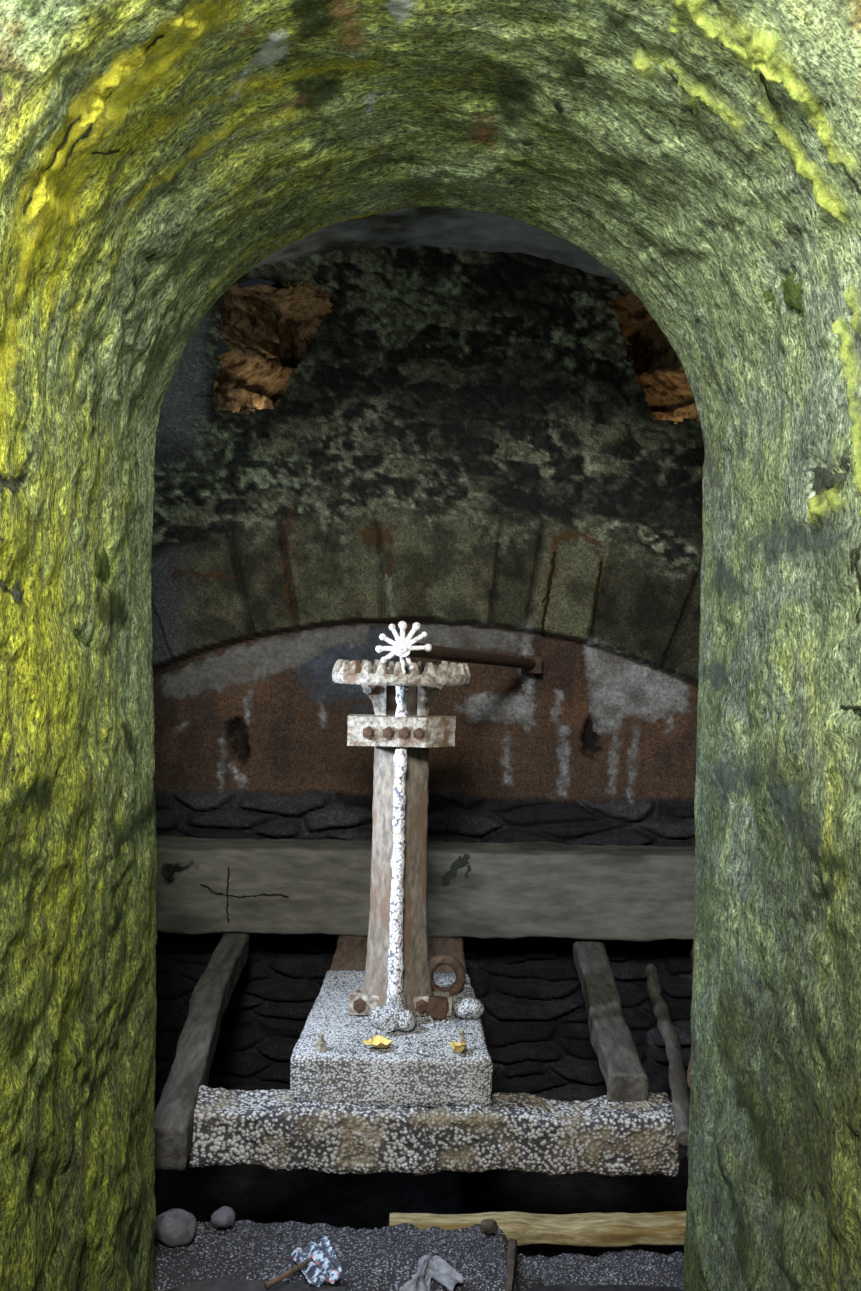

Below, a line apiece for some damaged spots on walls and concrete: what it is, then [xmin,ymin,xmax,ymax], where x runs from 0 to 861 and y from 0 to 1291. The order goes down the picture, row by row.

crack [23,35,164,215]
crack [640,44,718,112]
crack [714,0,861,218]
water stain [518,625,533,656]
water stain [468,673,537,731]
water stain [551,690,570,796]
water stain [584,640,687,802]